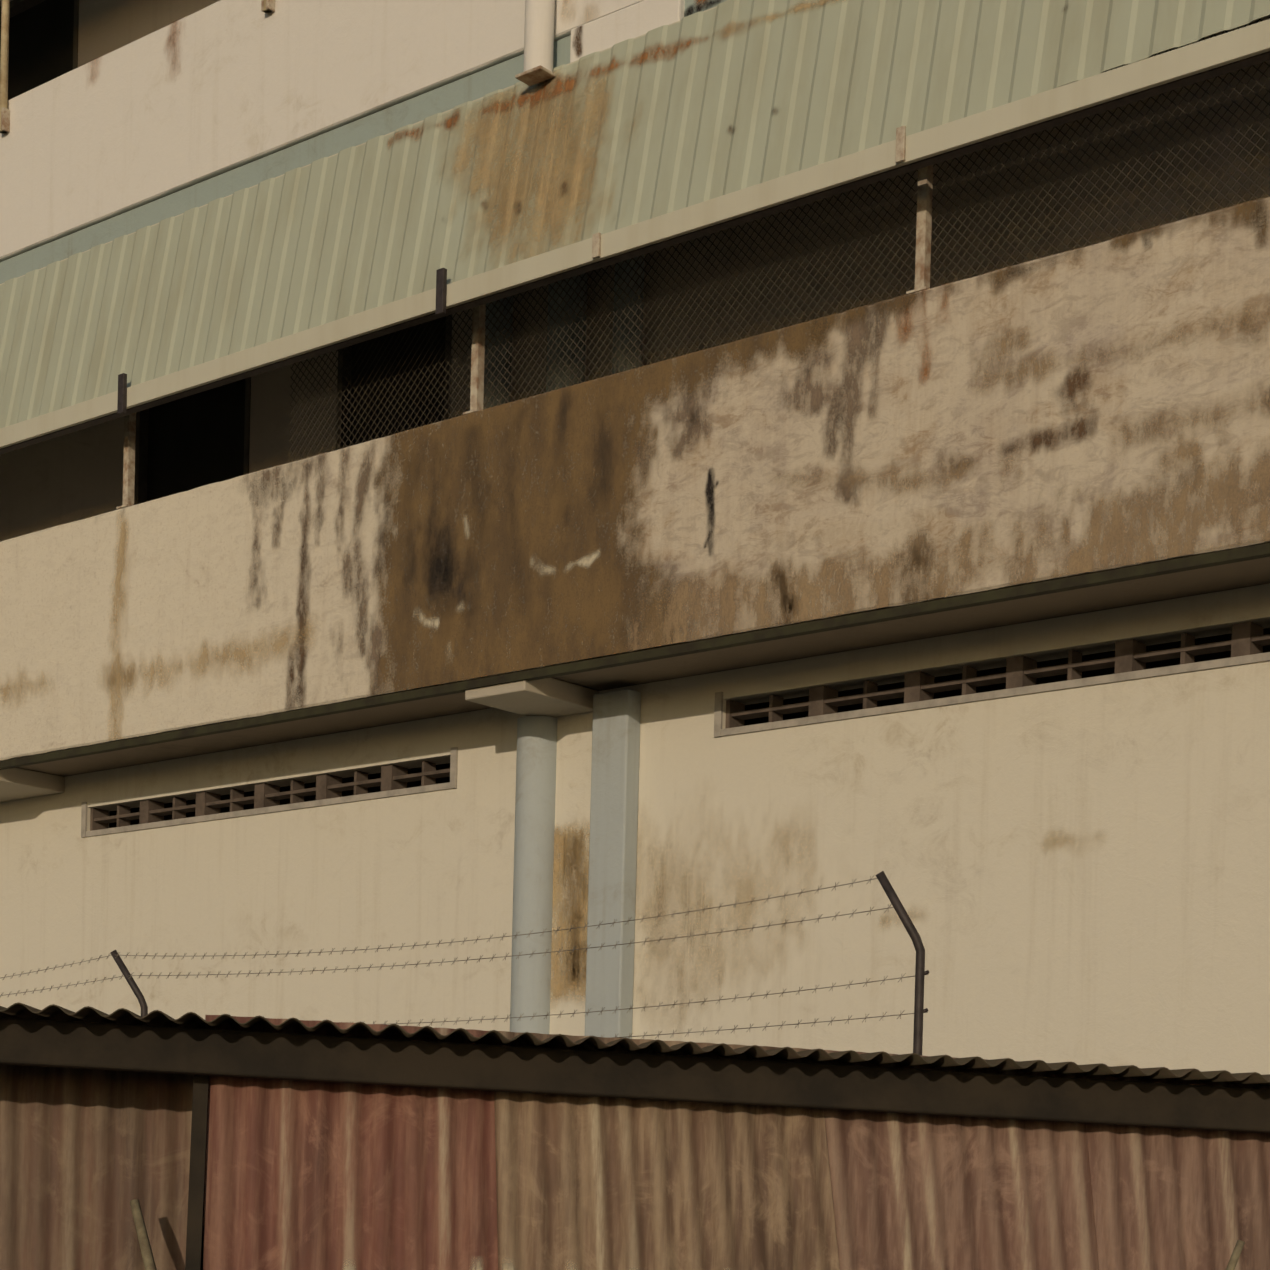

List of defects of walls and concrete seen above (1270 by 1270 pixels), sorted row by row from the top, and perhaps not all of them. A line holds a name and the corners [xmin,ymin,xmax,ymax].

corrosion [483,78,576,113]
corrosion [590,40,691,76]
leakage [1112,225,1161,247]
leakage [1234,198,1268,243]
leakage [990,265,1021,289]
leakage [252,465,284,545]
leakage [337,292,922,696]
leakage [114,522,126,621]
leakage [274,454,324,709]
leakage [869,530,986,608]
leakage [550,828,590,998]